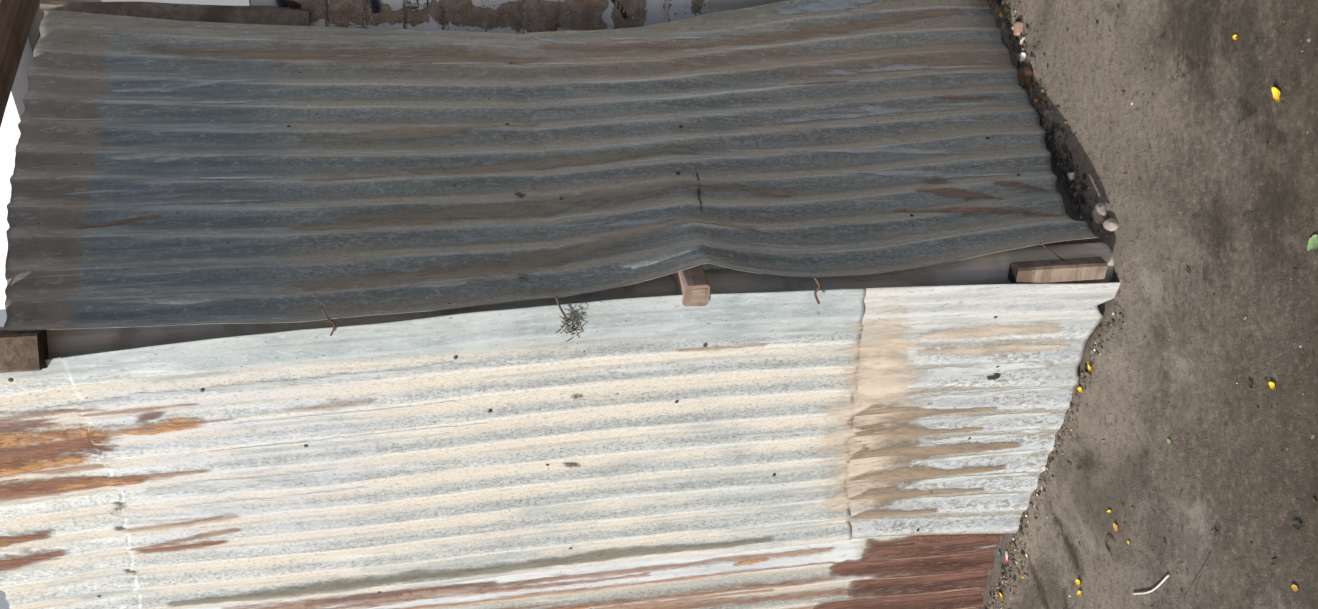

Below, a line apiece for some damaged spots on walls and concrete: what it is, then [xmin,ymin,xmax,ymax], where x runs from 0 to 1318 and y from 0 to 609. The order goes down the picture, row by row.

spalling [293,0,647,33]
spalling [691,0,704,14]
rust [0,404,227,503]
rust [0,531,64,571]
rust [126,517,240,553]
rust [226,534,1003,609]